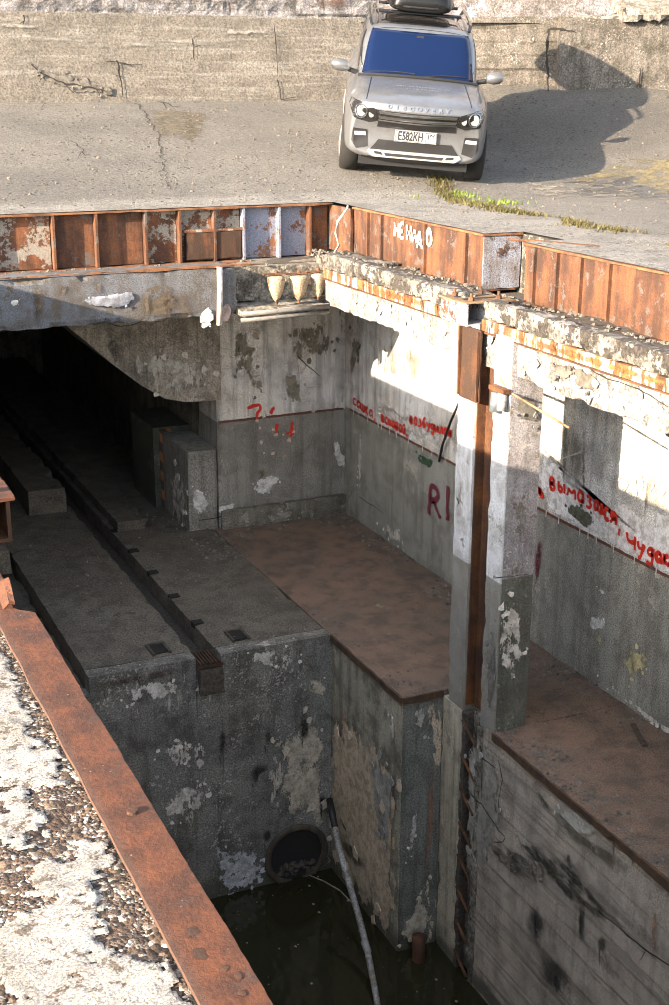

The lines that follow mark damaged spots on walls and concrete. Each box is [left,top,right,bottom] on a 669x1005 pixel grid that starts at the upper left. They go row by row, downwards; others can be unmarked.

corrosion [514,334,665,385]
peeling [512,395,540,429]
peeling [522,358,669,419]
peeling [484,591,528,715]
peeling [301,677,326,695]
peeling [415,707,435,739]
peeling [270,706,417,935]
water stain [560,815,618,865]
peeling [217,845,266,895]
peeling [397,875,432,948]
water stain [519,841,608,935]
corrosion [185,927,209,960]